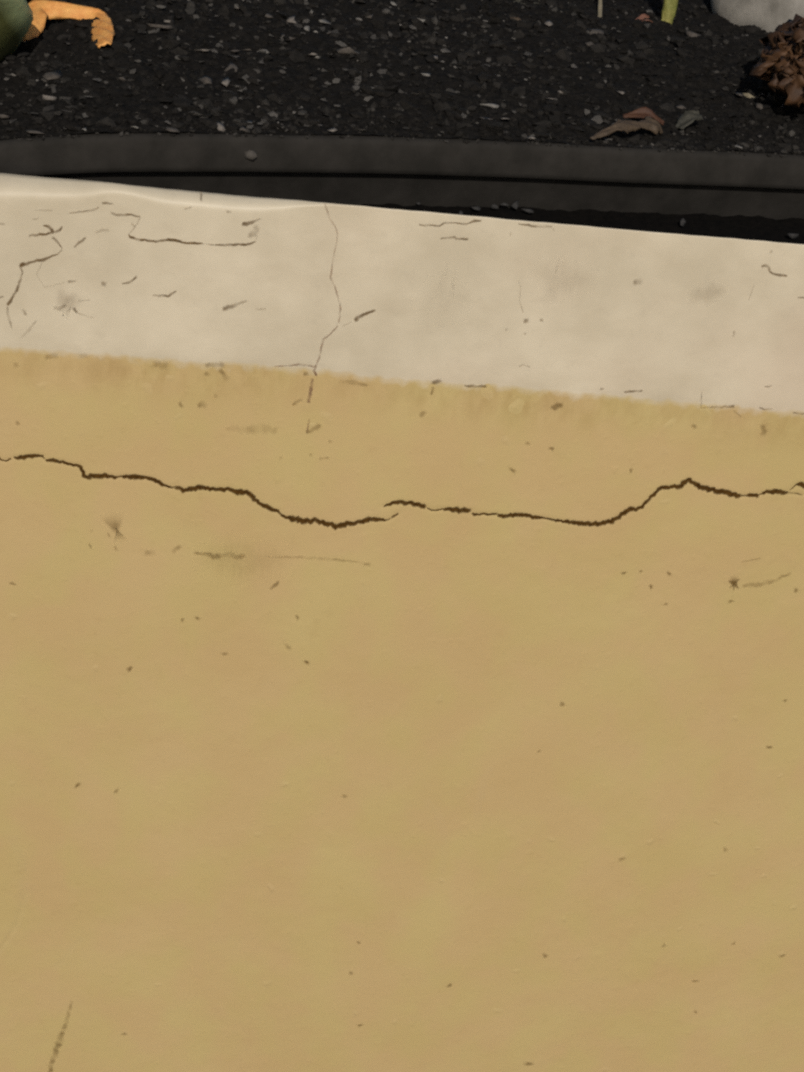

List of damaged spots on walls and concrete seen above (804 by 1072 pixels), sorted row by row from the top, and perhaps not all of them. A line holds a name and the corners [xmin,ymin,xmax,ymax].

crack [103,203,254,246]
crack [7,225,62,305]
crack [0,454,804,530]